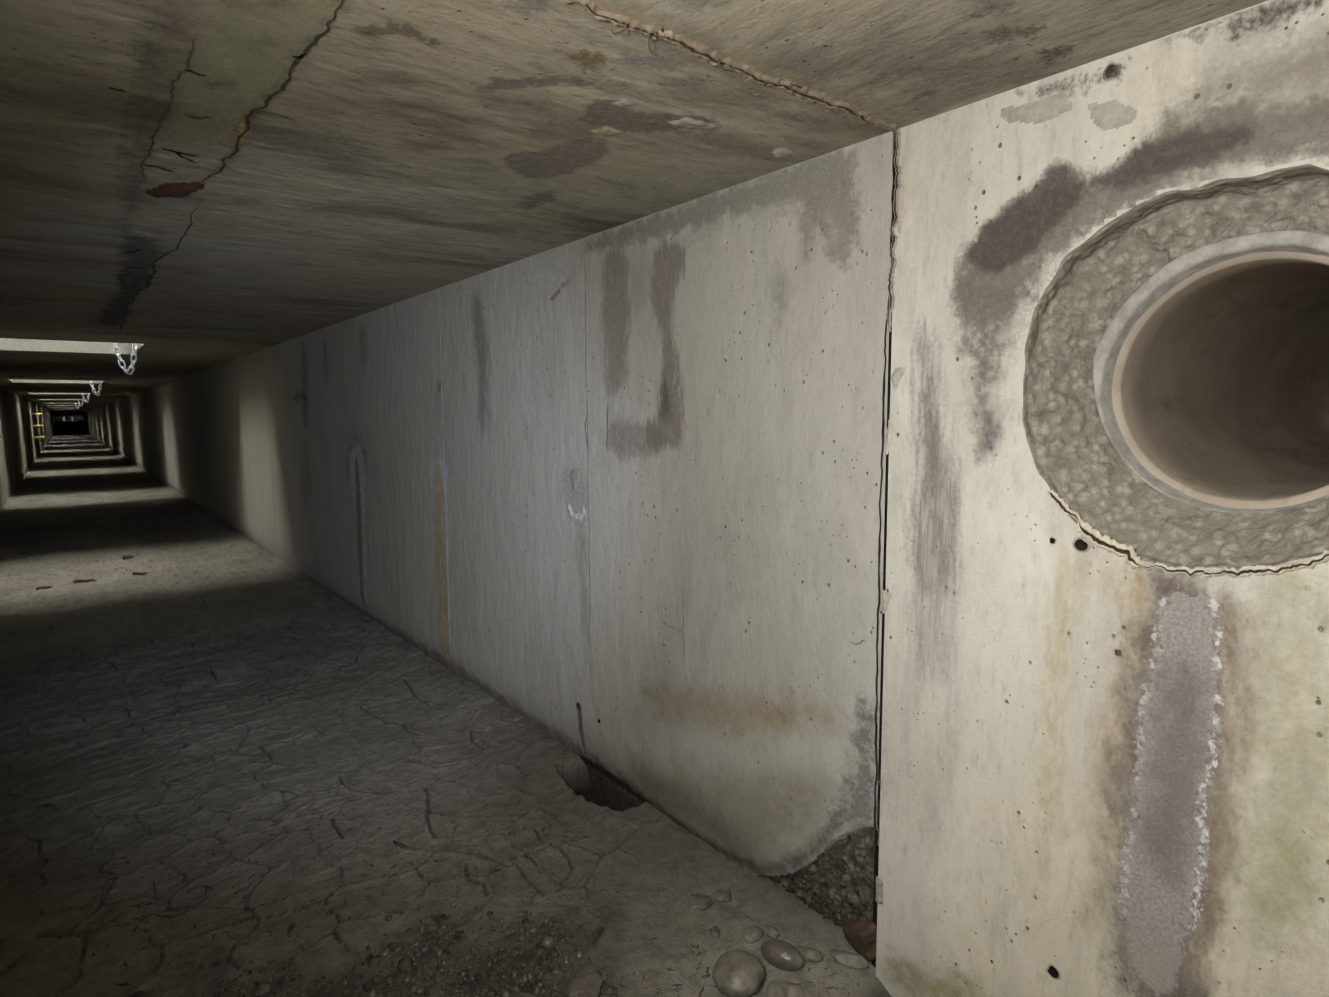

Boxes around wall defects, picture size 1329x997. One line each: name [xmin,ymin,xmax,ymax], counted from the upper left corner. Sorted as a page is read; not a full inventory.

rust [146,182,205,198]
crack [115,0,344,337]
damp [588,151,857,451]
crack [563,0,937,933]
damp [954,39,1329,451]
spalling [769,828,877,961]
damp [1113,571,1229,997]